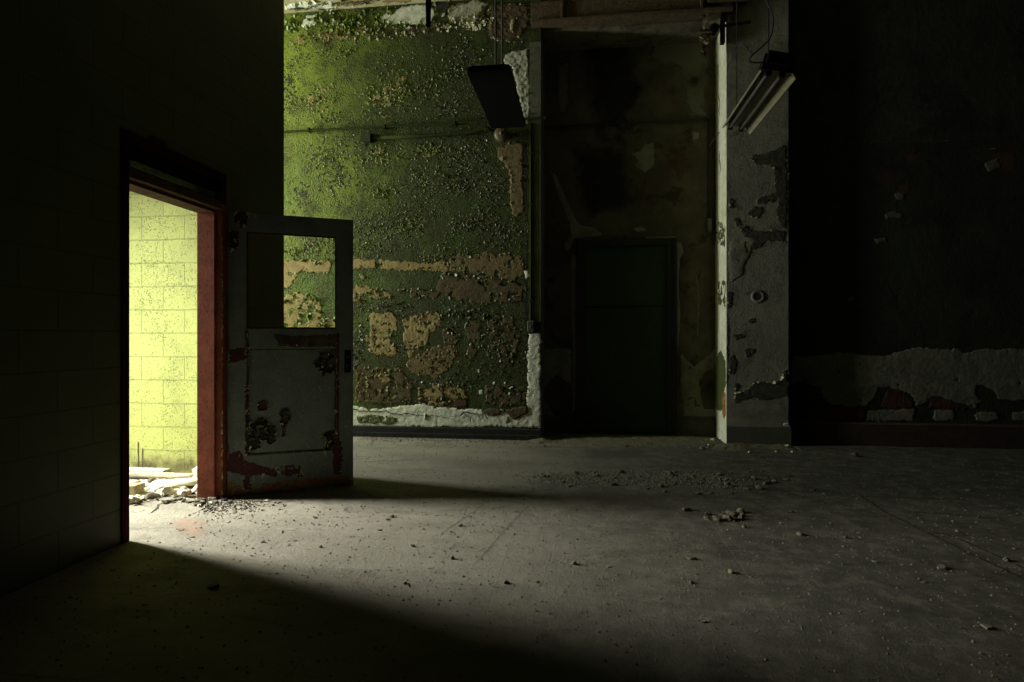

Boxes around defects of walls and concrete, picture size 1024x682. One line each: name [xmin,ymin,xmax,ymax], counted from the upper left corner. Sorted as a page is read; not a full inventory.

peeling [284,237,344,475]
flaking render [284,0,543,429]
flaking render [632,64,1024,416]